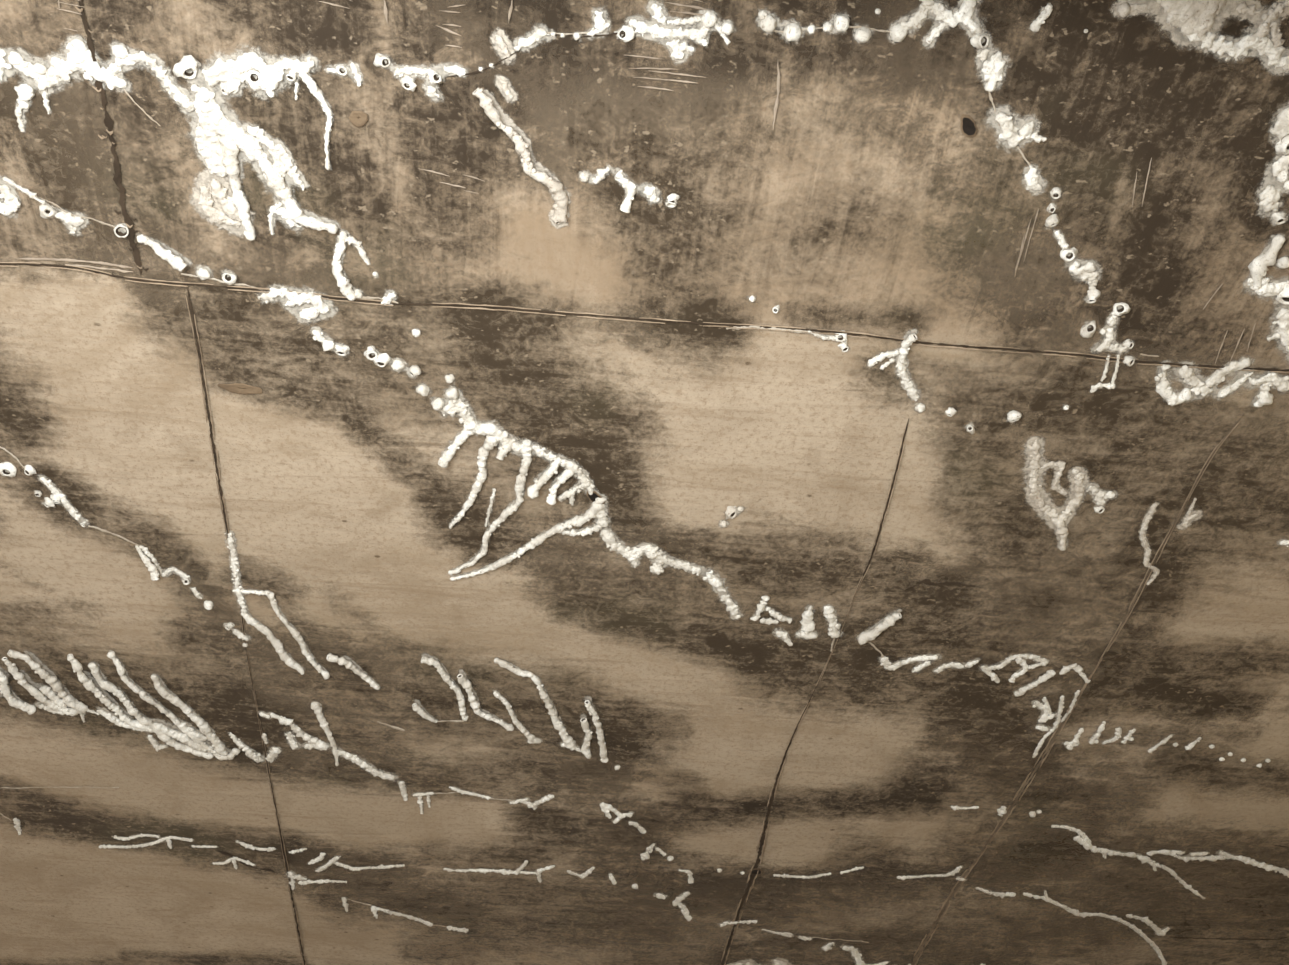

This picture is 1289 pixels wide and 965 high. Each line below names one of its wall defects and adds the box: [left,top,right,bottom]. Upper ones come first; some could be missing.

water stain [819,98,917,152]
water stain [926,164,952,199]
water stain [761,172,909,284]
water stain [784,298,934,413]
water stain [719,506,744,528]
crack [906,579,978,590]
water stain [1089,721,1289,797]
water stain [90,952,303,965]